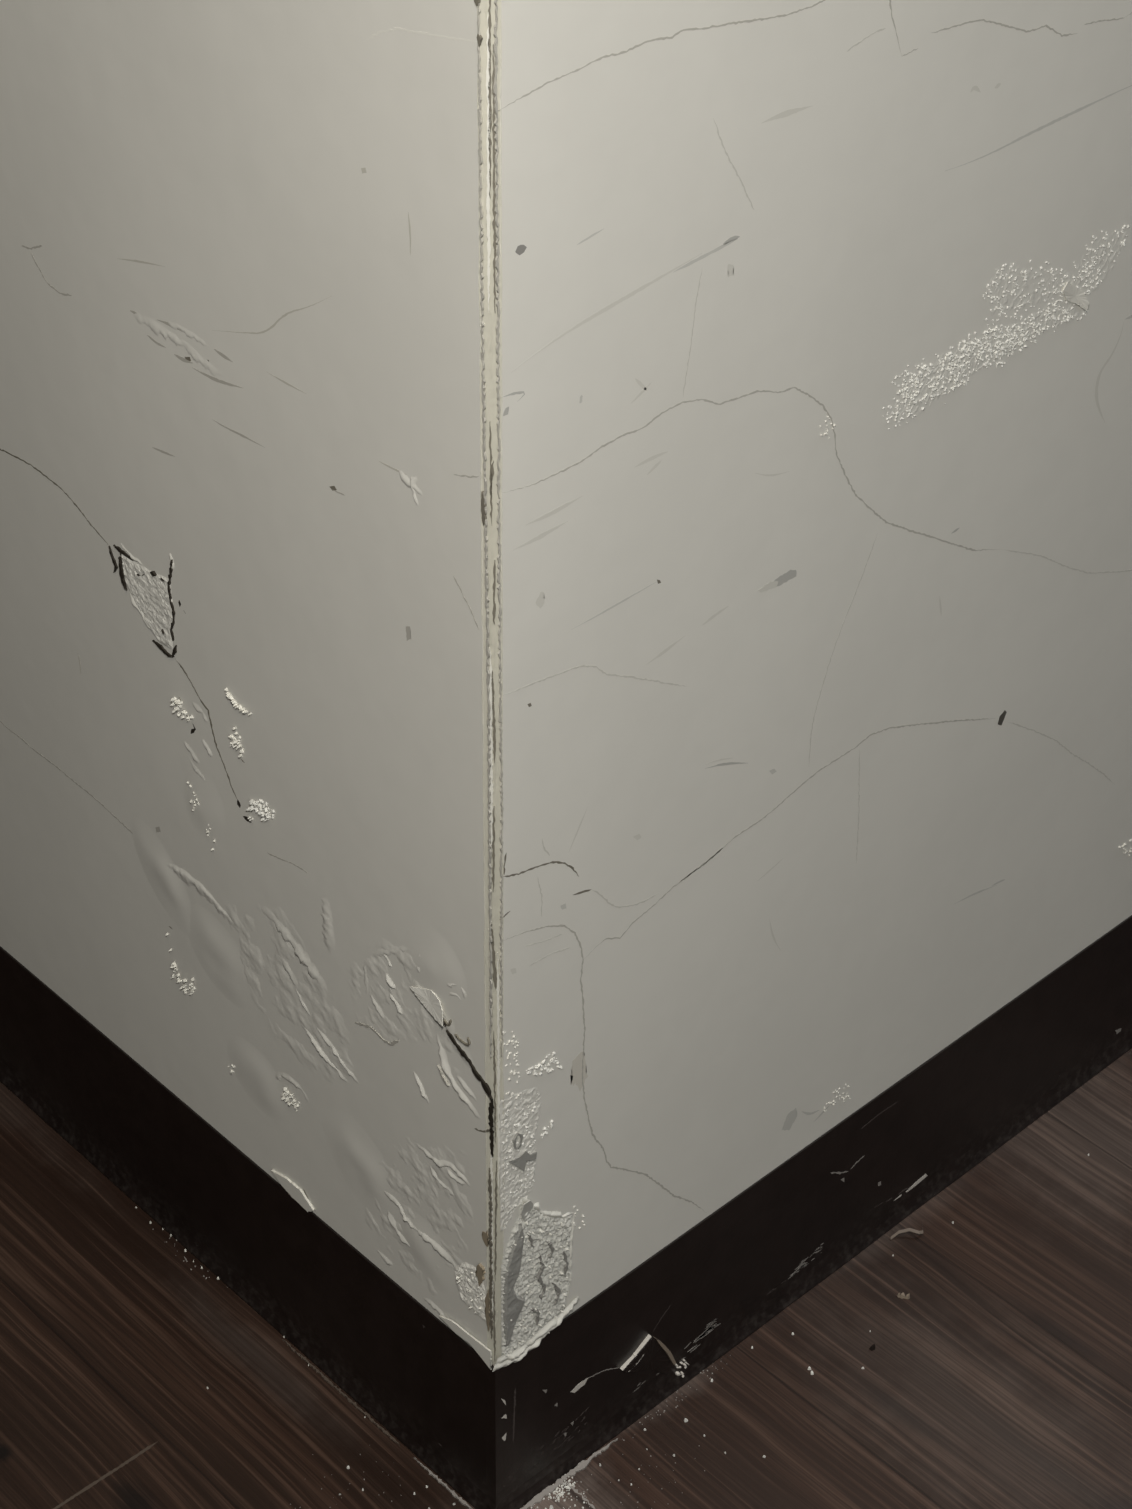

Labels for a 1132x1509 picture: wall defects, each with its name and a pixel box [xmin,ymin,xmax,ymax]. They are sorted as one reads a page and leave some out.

spalling [883,225,1129,430]
crack [0,449,133,591]
peeling [119,543,186,650]
peeling [170,697,196,734]
crack [152,559,242,796]
peeling [224,688,252,763]
crack [437,0,1132,1360]
peeling [237,799,275,823]
spalling [454,1031,585,1372]